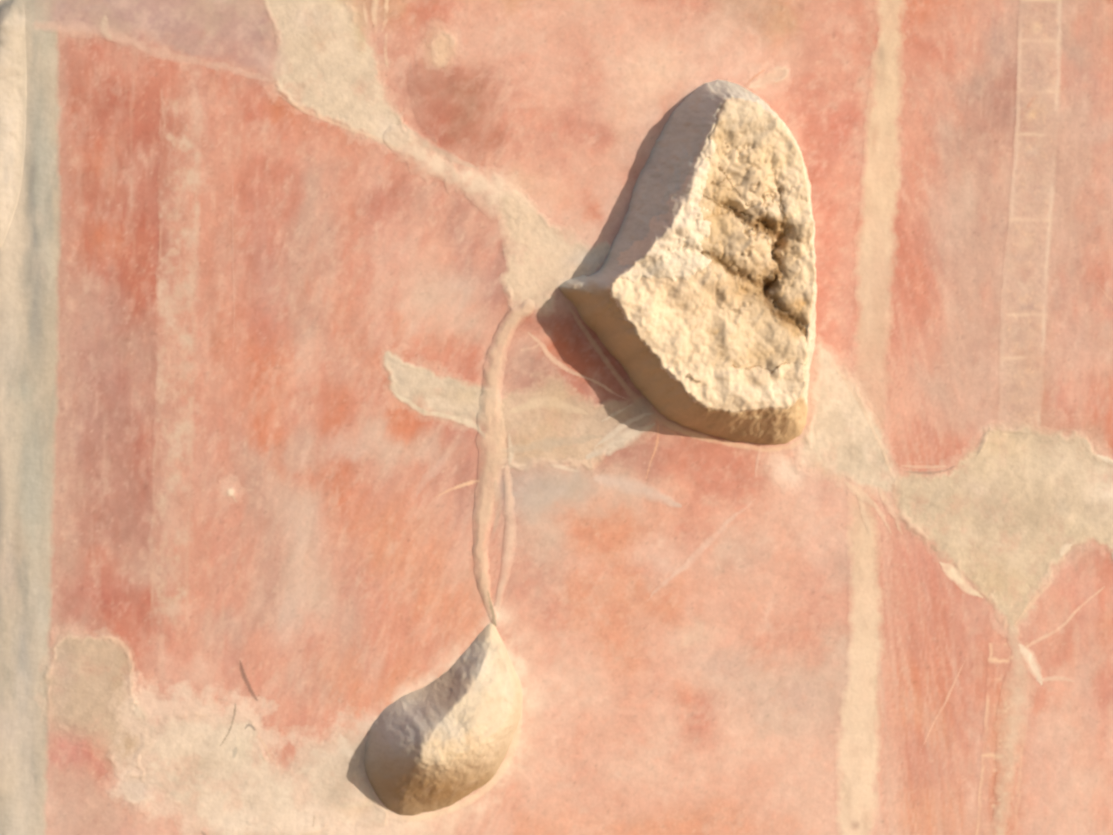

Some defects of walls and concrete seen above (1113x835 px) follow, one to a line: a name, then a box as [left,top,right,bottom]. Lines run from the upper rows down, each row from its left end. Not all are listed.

flaking render [263,0,405,155]
peeling [413,17,467,78]
flaking render [377,343,482,434]
crack [436,299,536,627]
flaking render [501,367,657,469]
flaking render [759,332,1113,639]